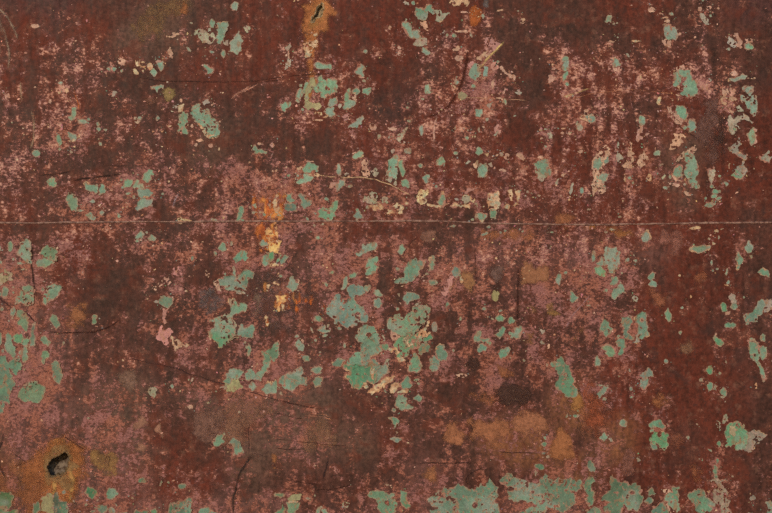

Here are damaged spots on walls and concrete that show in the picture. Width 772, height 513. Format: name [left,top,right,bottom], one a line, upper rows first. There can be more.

rust [302,0,336,98]
peeling [280,0,596,236]
peeling [560,64,758,208]
peeling [0,238,63,414]
peeling [205,241,255,357]
rust [252,194,287,252]
peeling [220,334,323,395]
peeling [236,161,353,312]
peeling [310,242,464,443]
rust [521,261,549,285]
rust [20,437,118,513]
rust [444,410,575,460]